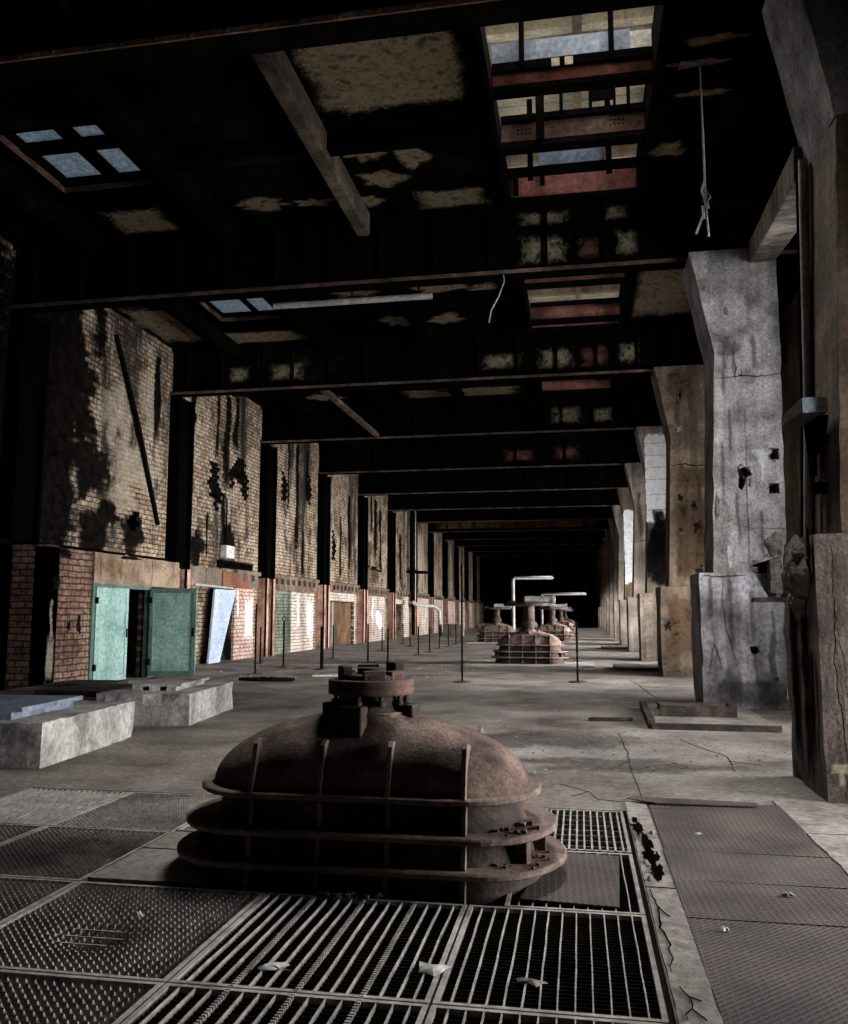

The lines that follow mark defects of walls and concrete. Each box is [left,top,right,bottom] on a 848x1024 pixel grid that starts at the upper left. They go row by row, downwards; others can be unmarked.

peeling [296,31,465,112]
peeling [107,209,176,233]
peeling [344,148,431,207]
peeling [413,187,488,208]
damp [153,356,162,442]
damp [205,395,240,559]
spalling [738,463,753,490]
damp [57,546,72,558]
crack [561,731,642,802]
crack [680,739,758,771]
spalling [632,817,665,881]
crack [650,889,707,1021]